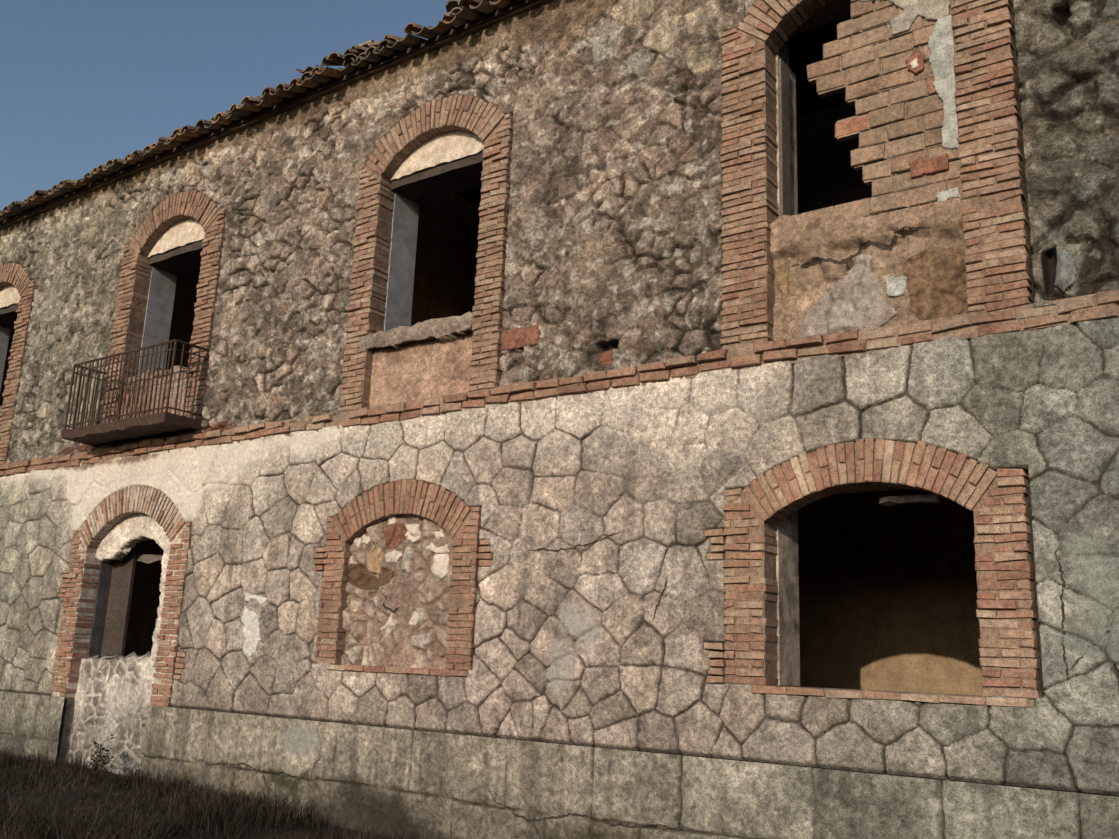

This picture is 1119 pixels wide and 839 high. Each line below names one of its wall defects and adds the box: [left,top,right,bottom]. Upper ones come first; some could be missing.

flaking render [860,0,959,178]
crack [792,226,931,272]
flaking render [936,187,961,201]
crack [1054,542,1119,696]